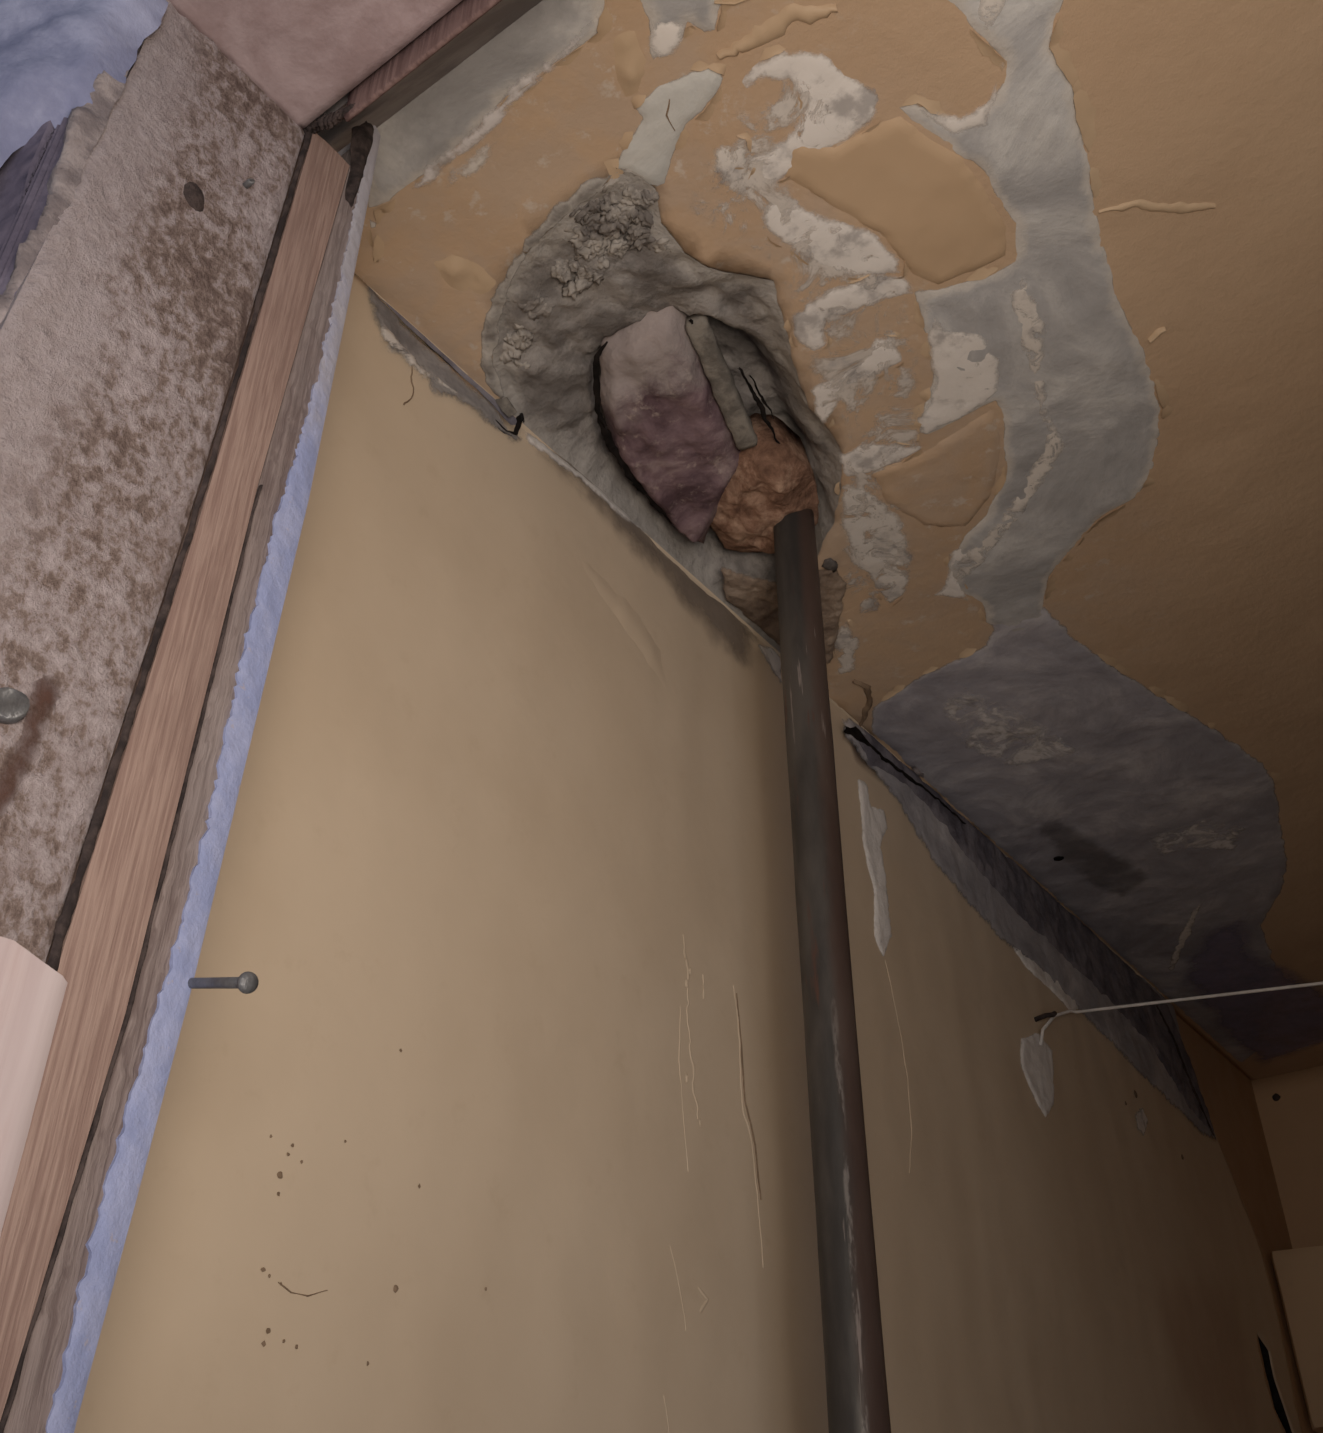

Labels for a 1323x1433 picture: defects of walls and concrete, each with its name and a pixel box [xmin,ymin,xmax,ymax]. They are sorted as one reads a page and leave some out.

peeling [367,0,1287,1139]
rust [0,680,55,807]
leakage [1190,928,1323,1060]